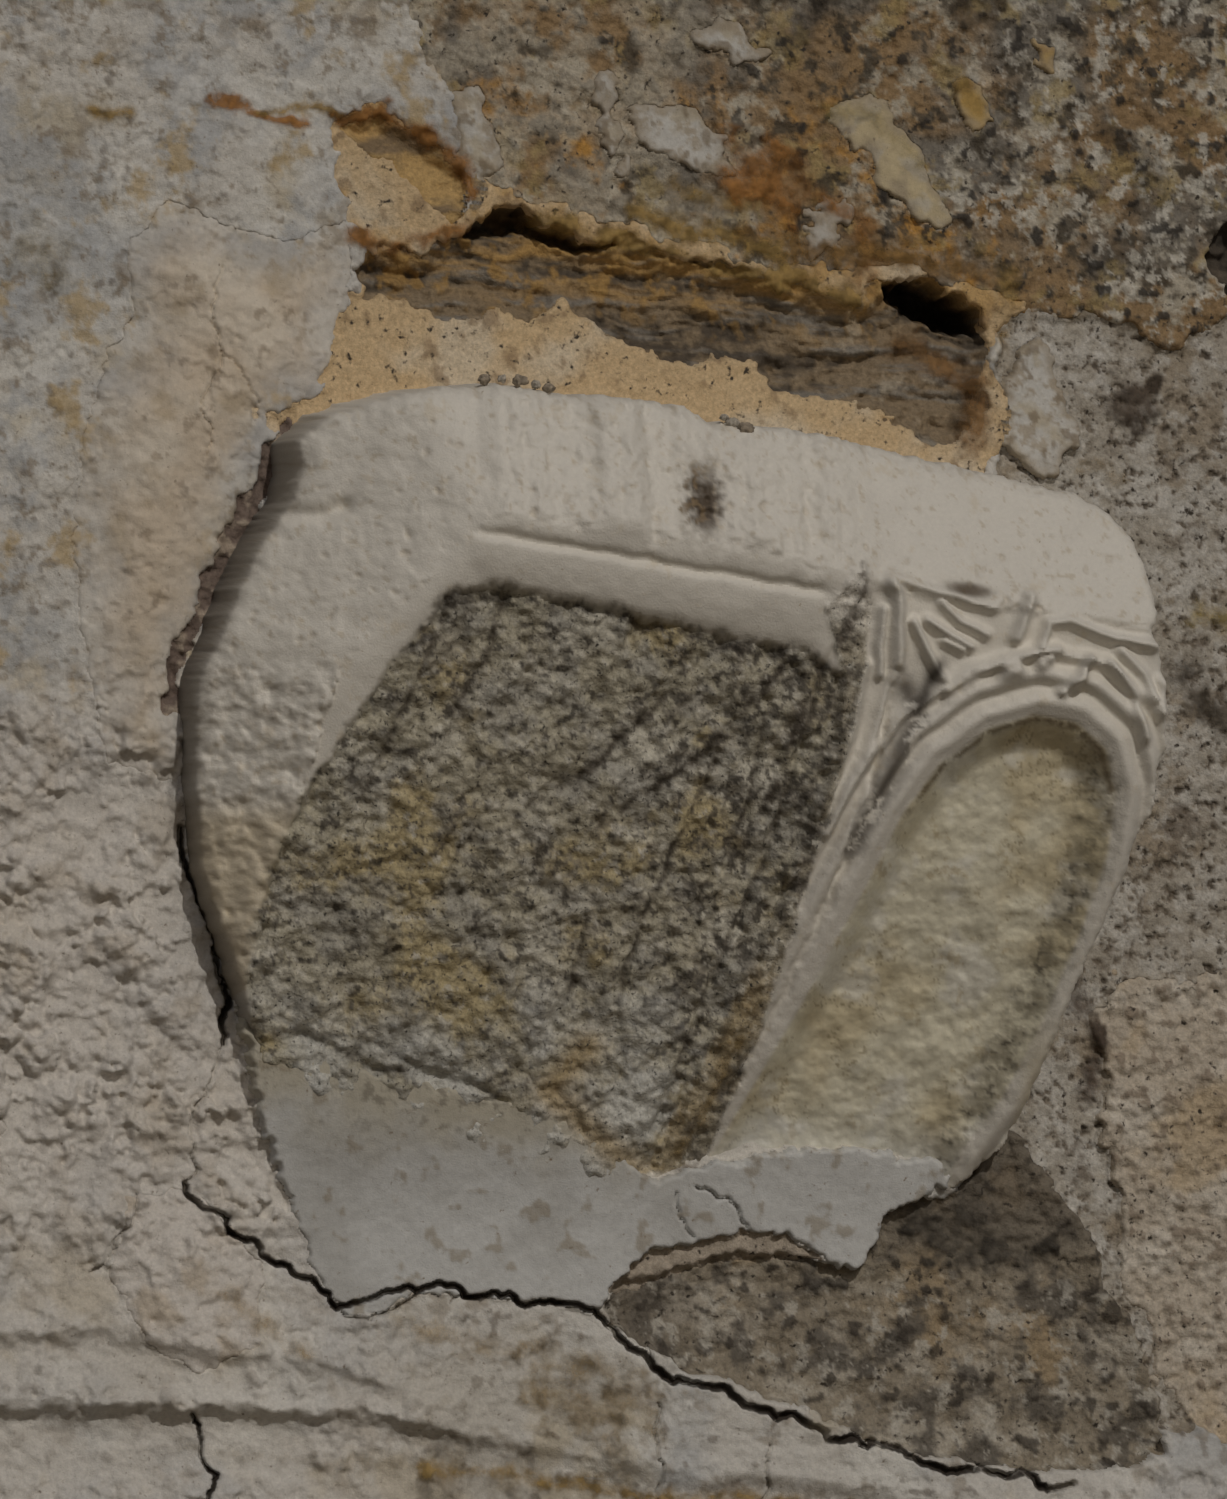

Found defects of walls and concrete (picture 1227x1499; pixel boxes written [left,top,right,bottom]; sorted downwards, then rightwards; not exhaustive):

corrosion [206,93,477,200]
corrosion [351,226,402,254]
peeling [252,0,1227,1472]
crack [179,826,205,915]
crack [213,956,233,1046]
crack [184,1183,1056,1499]